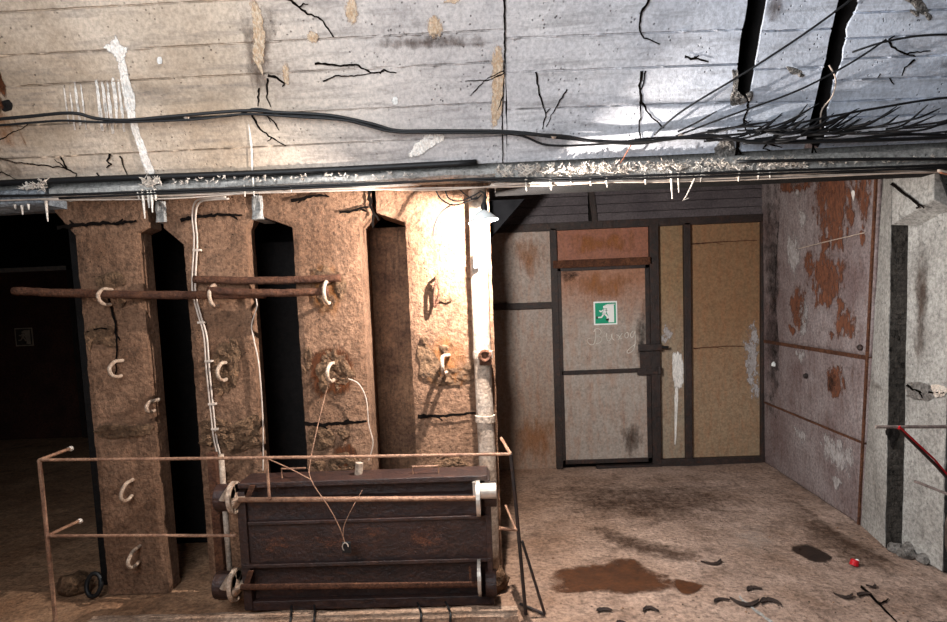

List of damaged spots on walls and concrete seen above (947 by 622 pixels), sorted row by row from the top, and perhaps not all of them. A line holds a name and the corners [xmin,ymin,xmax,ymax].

crack [288,0,334,37]
crack [639,0,660,44]
crack [315,62,396,82]
crack [535,72,567,129]
spalling [730,69,753,106]
spalling [212,337,241,397]
spalling [302,347,356,393]
spalling [198,415,265,454]
spalling [308,427,360,471]
water stain [554,527,703,594]